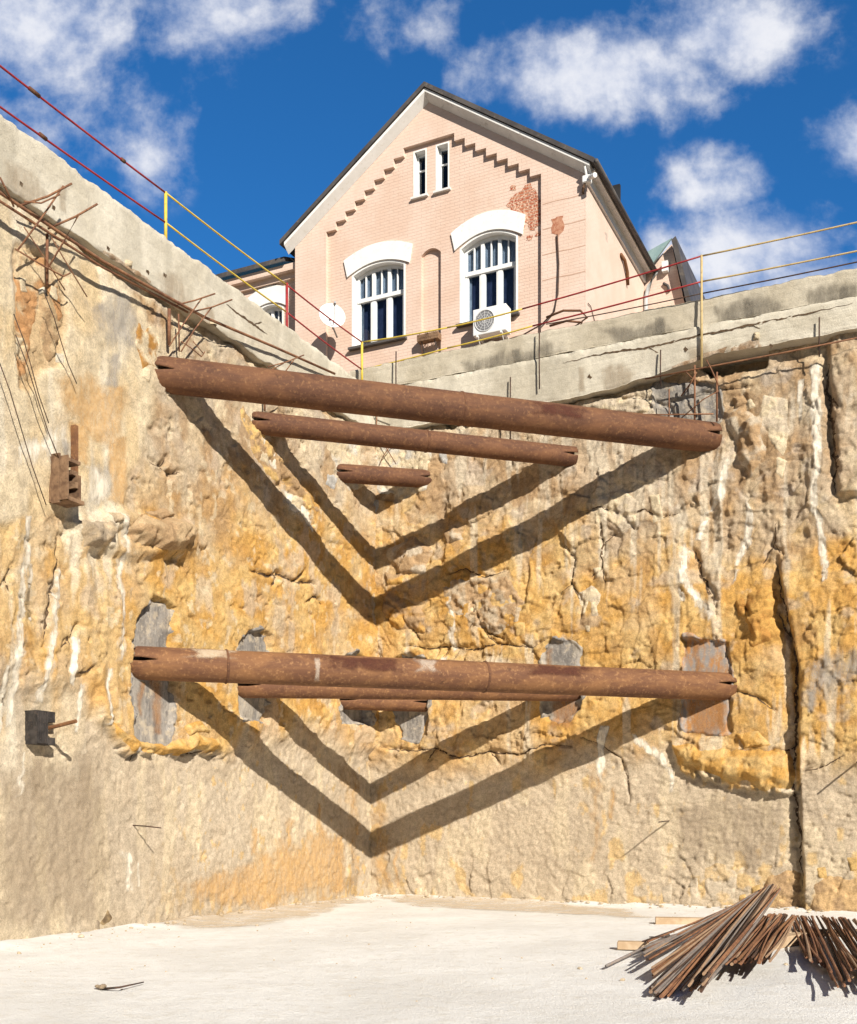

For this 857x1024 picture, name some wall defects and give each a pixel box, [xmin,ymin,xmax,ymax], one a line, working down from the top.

peeling [506,183,541,241]
damp [797,364,829,581]
damp [0,516,33,732]
damp [36,569,61,702]
damp [69,636,83,732]
damp [106,669,114,725]
damp [117,513,130,658]
crack [739,522,842,886]